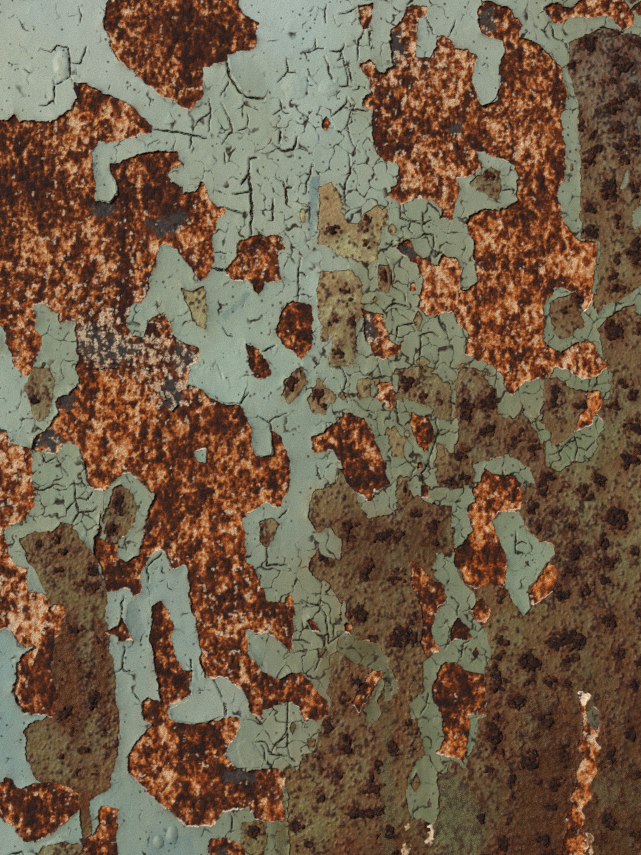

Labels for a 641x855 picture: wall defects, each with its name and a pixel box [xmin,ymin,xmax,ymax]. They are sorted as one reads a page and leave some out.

rust [102,0,269,111]
crack [154,5,371,206]
peeling [181,286,207,329]
crack [225,157,312,235]
crack [385,205,448,361]
rust [357,0,641,471]
peeling [24,366,55,422]
peeling [100,472,155,562]
rust [0,82,401,855]
peeling [281,26,641,855]
rust [420,446,632,659]
crack [258,701,295,762]